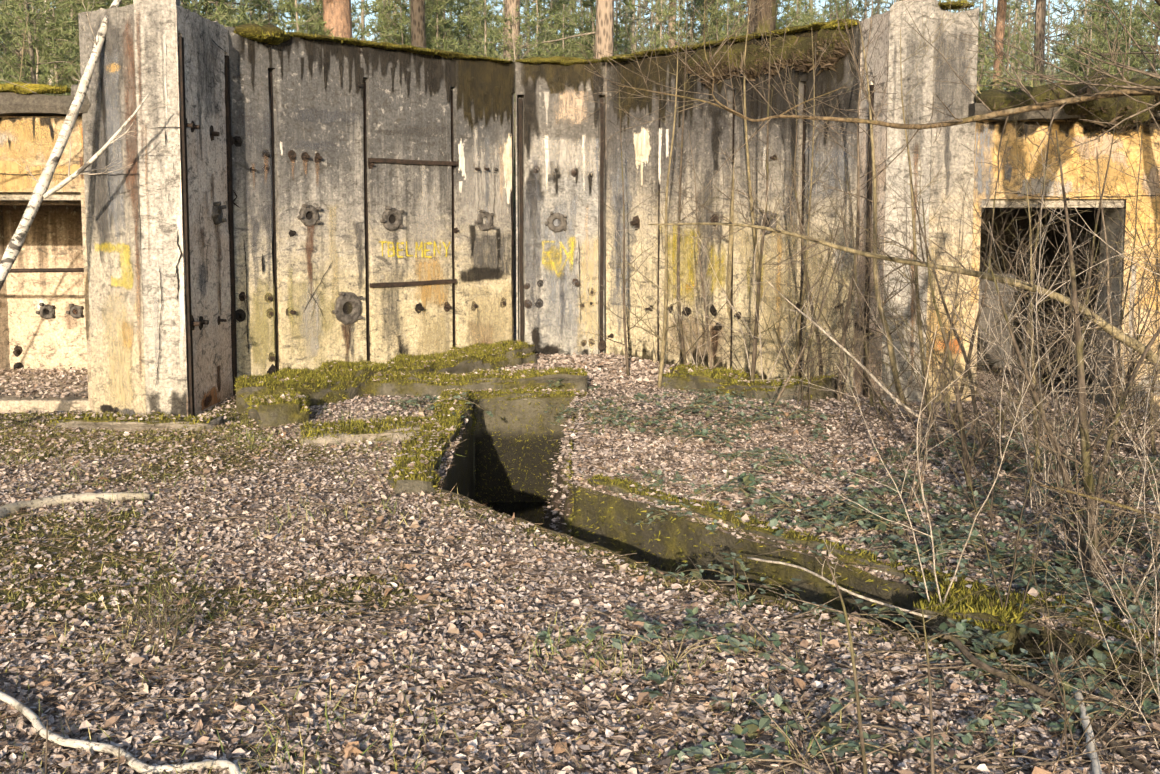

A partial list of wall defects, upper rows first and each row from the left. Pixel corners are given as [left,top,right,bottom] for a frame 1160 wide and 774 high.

peeling [1004,132,1160,198]
leakage [240,26,873,391]
rust [306,226,314,293]
rust [341,325,350,361]